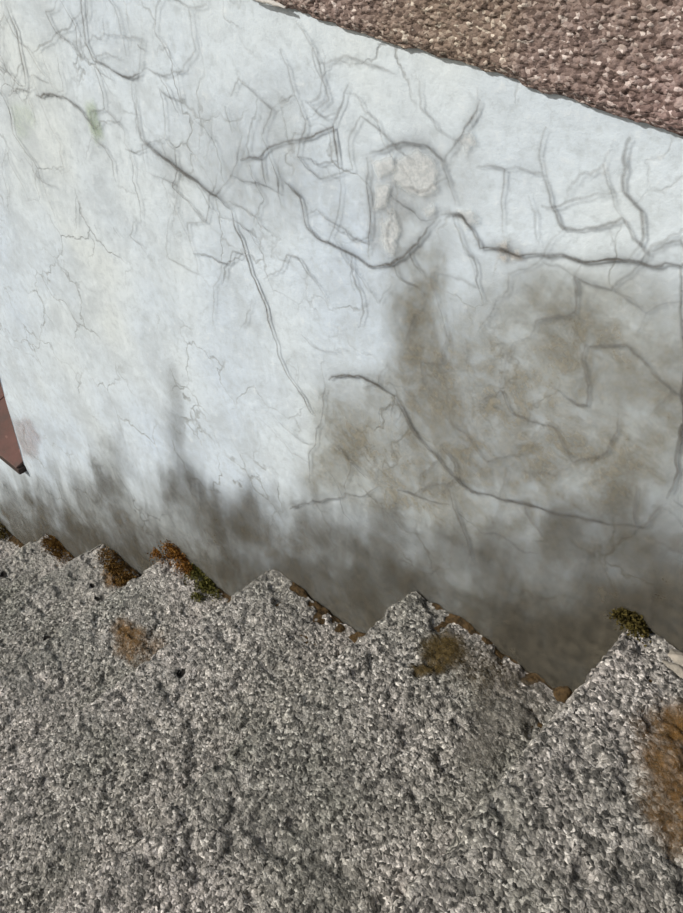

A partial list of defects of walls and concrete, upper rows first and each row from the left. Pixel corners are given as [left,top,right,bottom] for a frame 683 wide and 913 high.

crack [39,93,90,122]
crack [133,148,219,199]
crack [248,126,338,160]
crack [286,183,427,267]
crack [380,141,438,157]
crack [622,155,644,234]
crack [233,220,272,330]
crack [451,213,683,339]
crack [331,374,552,543]
leakage [331,313,661,525]
crack [674,385,683,481]
leakage [0,475,683,694]